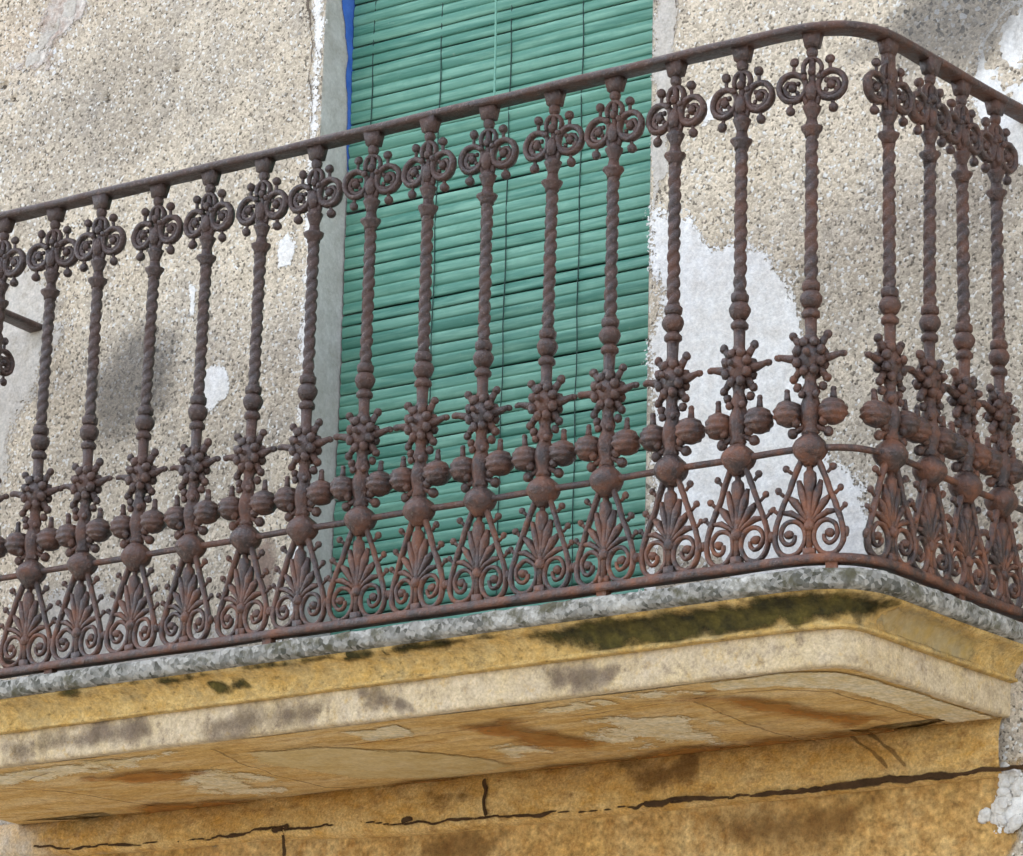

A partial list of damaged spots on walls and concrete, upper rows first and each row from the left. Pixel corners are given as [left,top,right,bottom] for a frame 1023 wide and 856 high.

crack [361,734,1023,826]
crack [33,823,333,856]